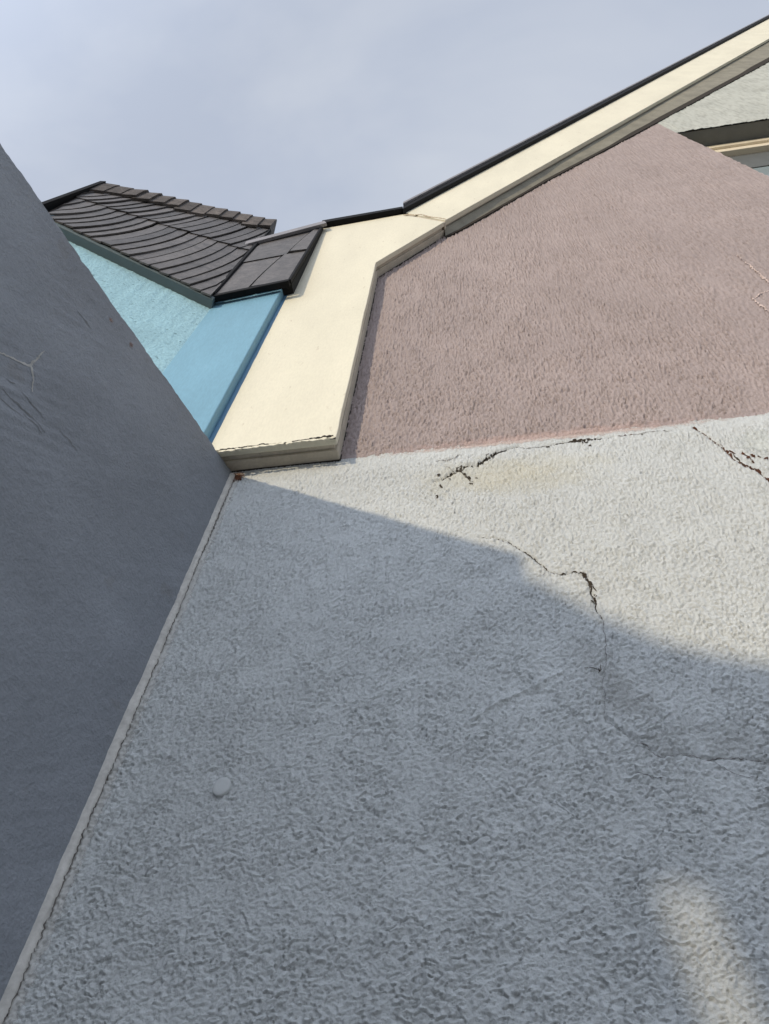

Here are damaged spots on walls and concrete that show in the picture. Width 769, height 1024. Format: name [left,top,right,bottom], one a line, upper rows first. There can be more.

crack [435,427,769,498]
crack [482,537,769,778]